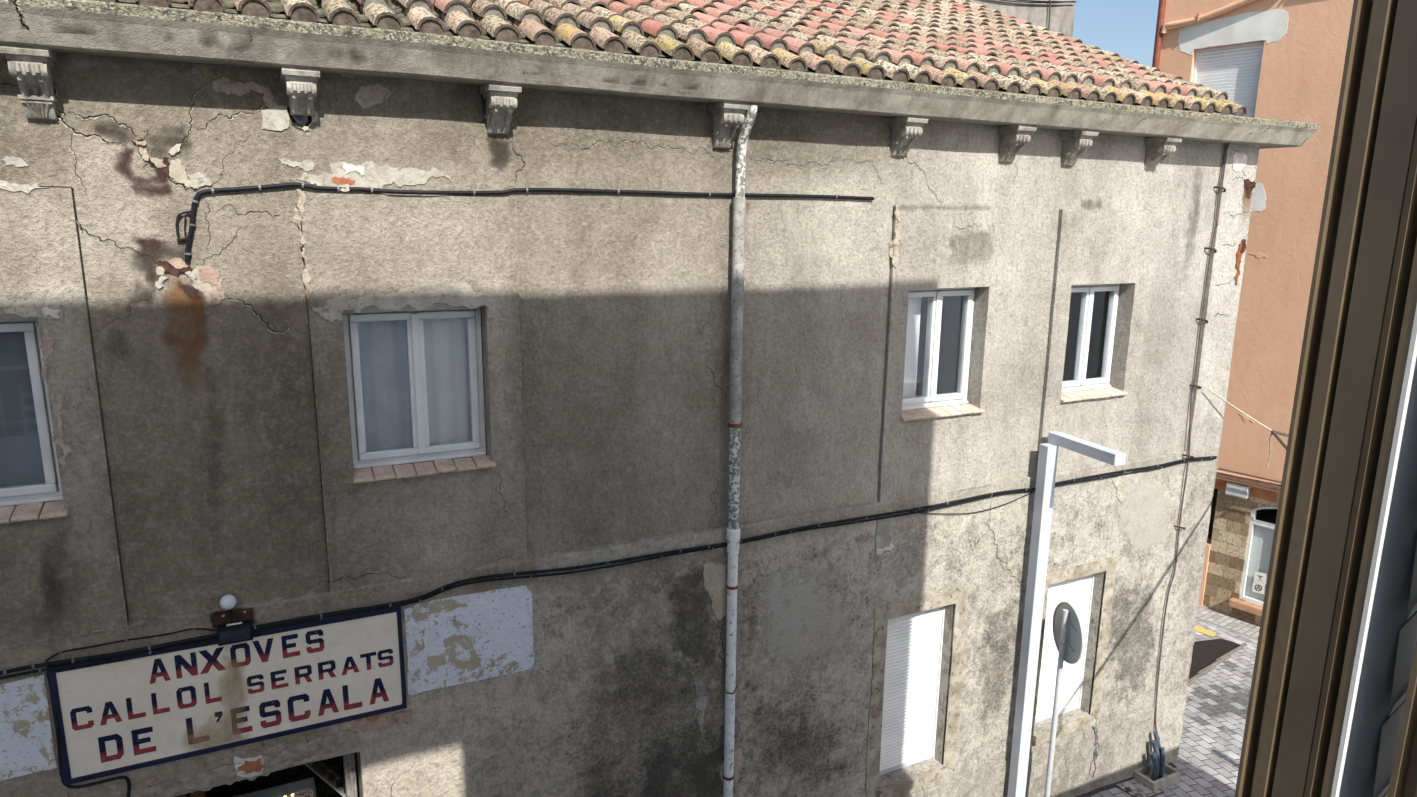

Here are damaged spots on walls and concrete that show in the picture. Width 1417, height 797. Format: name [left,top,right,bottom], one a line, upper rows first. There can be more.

peeling [0,156,49,194]
crack [53,80,287,331]
spalling [132,139,212,189]
peeling [279,158,504,322]
corrosion [168,282,203,362]
spalling [155,258,225,306]
crack [225,295,306,335]
peeling [0,297,72,469]
water stain [744,567,864,686]
water stain [590,572,723,797]
water stain [754,711,844,782]